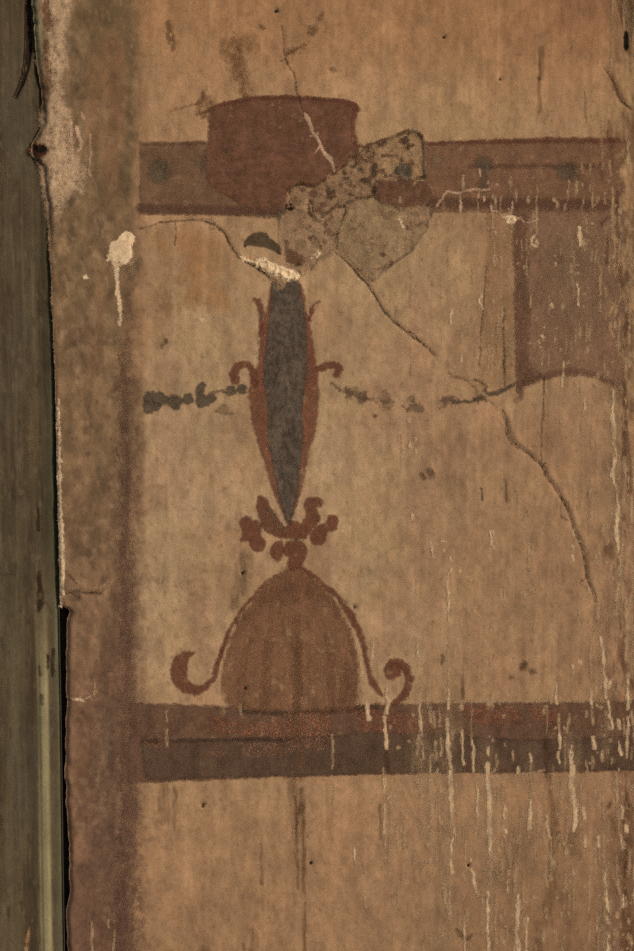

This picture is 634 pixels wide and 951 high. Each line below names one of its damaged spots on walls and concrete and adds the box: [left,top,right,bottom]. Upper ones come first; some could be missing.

crack [287,44,335,172]
efflorescence [106,231,136,326]
crack [161,217,253,266]
spalling [239,129,434,290]
crack [436,169,538,229]
crack [336,252,593,586]
water stain [365,687,397,846]
water stain [416,644,514,951]
water stain [516,754,540,831]
water stain [506,863,539,951]